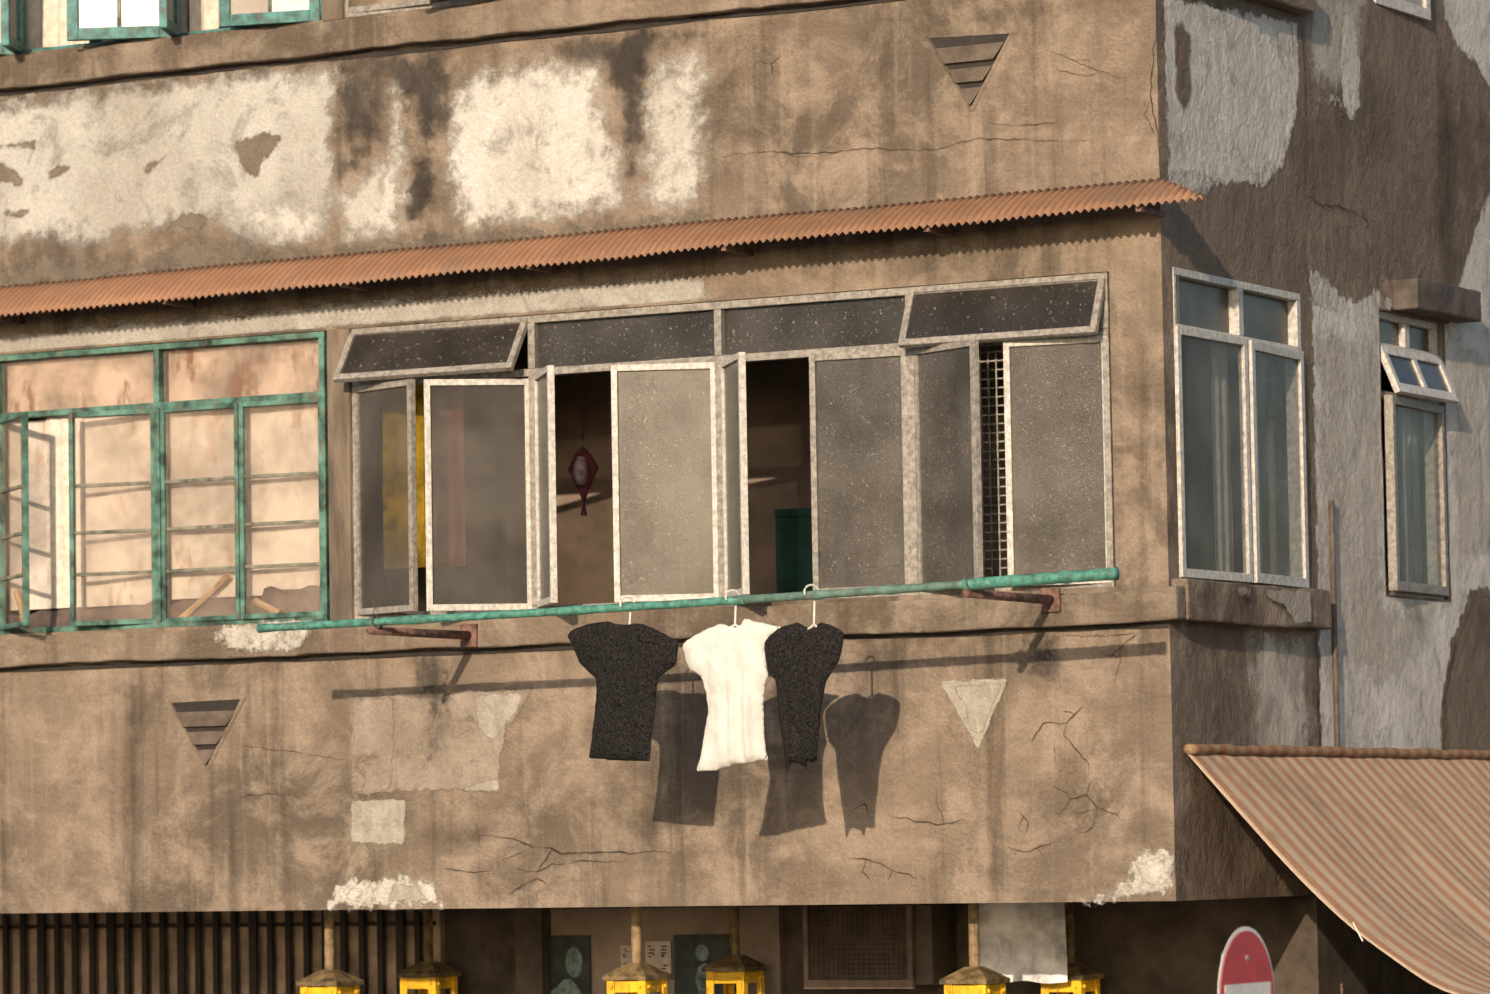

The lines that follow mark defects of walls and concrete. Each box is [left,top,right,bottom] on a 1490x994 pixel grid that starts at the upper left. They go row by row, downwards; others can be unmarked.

peeling [0,68,411,246]
water stain [342,58,451,169]
water stain [407,162,431,219]
water stain [563,27,656,142]
crack [1291,18,1369,230]
peeling [1444,0,1490,86]
peeling [1233,193,1490,750]
spalling [214,620,311,653]
crack [1008,707,1121,853]
spalling [327,874,444,910]
spalling [1082,849,1174,904]